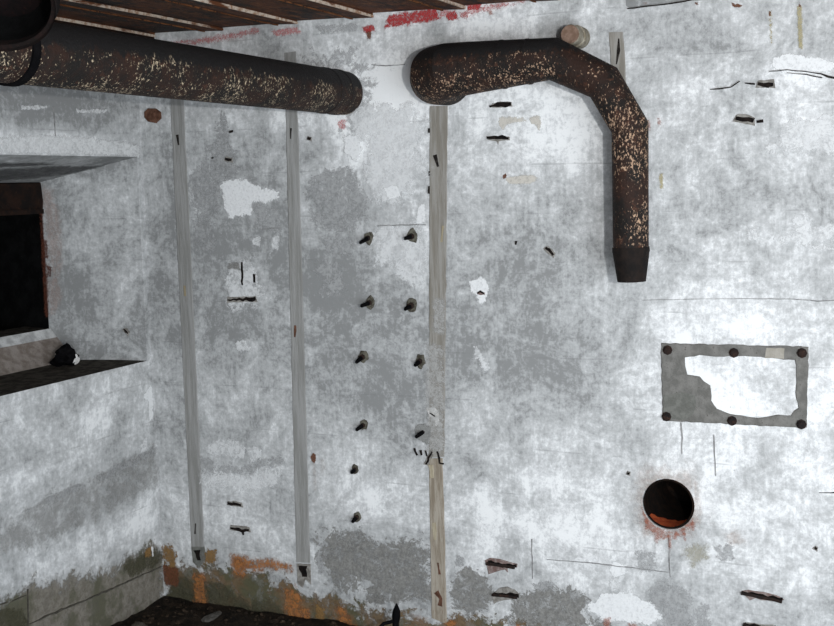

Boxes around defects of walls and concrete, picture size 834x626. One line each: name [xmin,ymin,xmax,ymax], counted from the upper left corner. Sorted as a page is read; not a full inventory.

crack [769,69,834,79]
peeling [219,178,282,219]
corrosion [643,513,694,547]
corrosion [192,572,206,603]
corrosion [204,549,217,564]
corrosion [230,554,292,578]
damp [0,539,541,626]
corrosion [285,588,357,626]
peeling [449,555,710,626]
peeling [635,550,656,572]